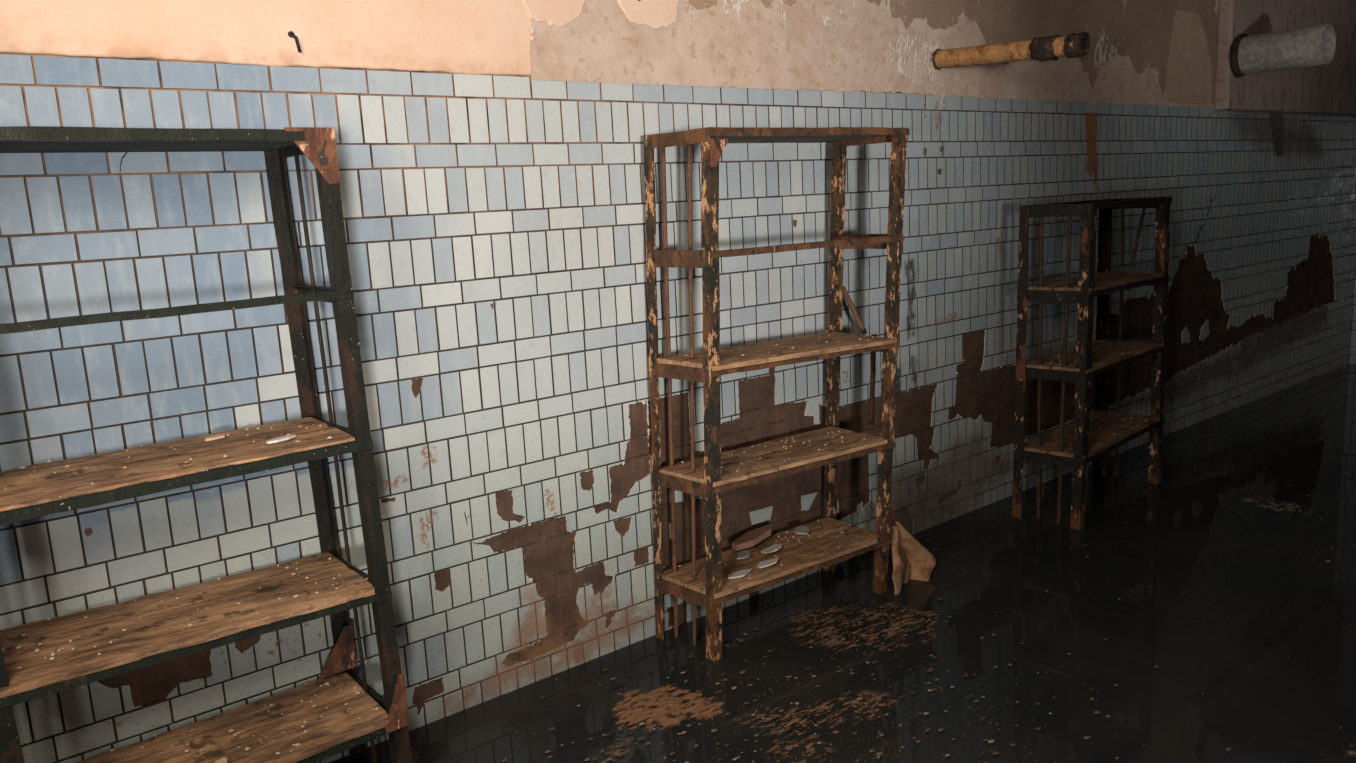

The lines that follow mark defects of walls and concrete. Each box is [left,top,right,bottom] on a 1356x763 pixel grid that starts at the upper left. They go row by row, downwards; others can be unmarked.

peeling [523,0,1214,108]
corrosion [1086,114,1097,181]
peeling [721,233,1336,579]
peeling [578,389,706,578]
peeling [466,487,618,667]
peeling [235,635,260,653]
peeling [665,601,688,628]
peeling [98,650,212,710]
peeling [411,674,444,715]